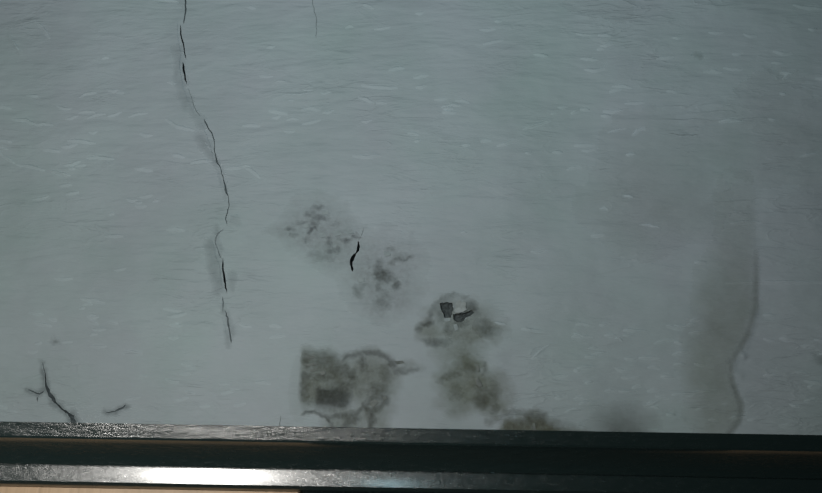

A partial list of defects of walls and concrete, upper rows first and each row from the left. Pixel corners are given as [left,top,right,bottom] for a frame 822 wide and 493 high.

crack [166,0,241,342]
crack [350,227,364,272]
flaking render [440,300,474,331]
crack [30,363,76,423]